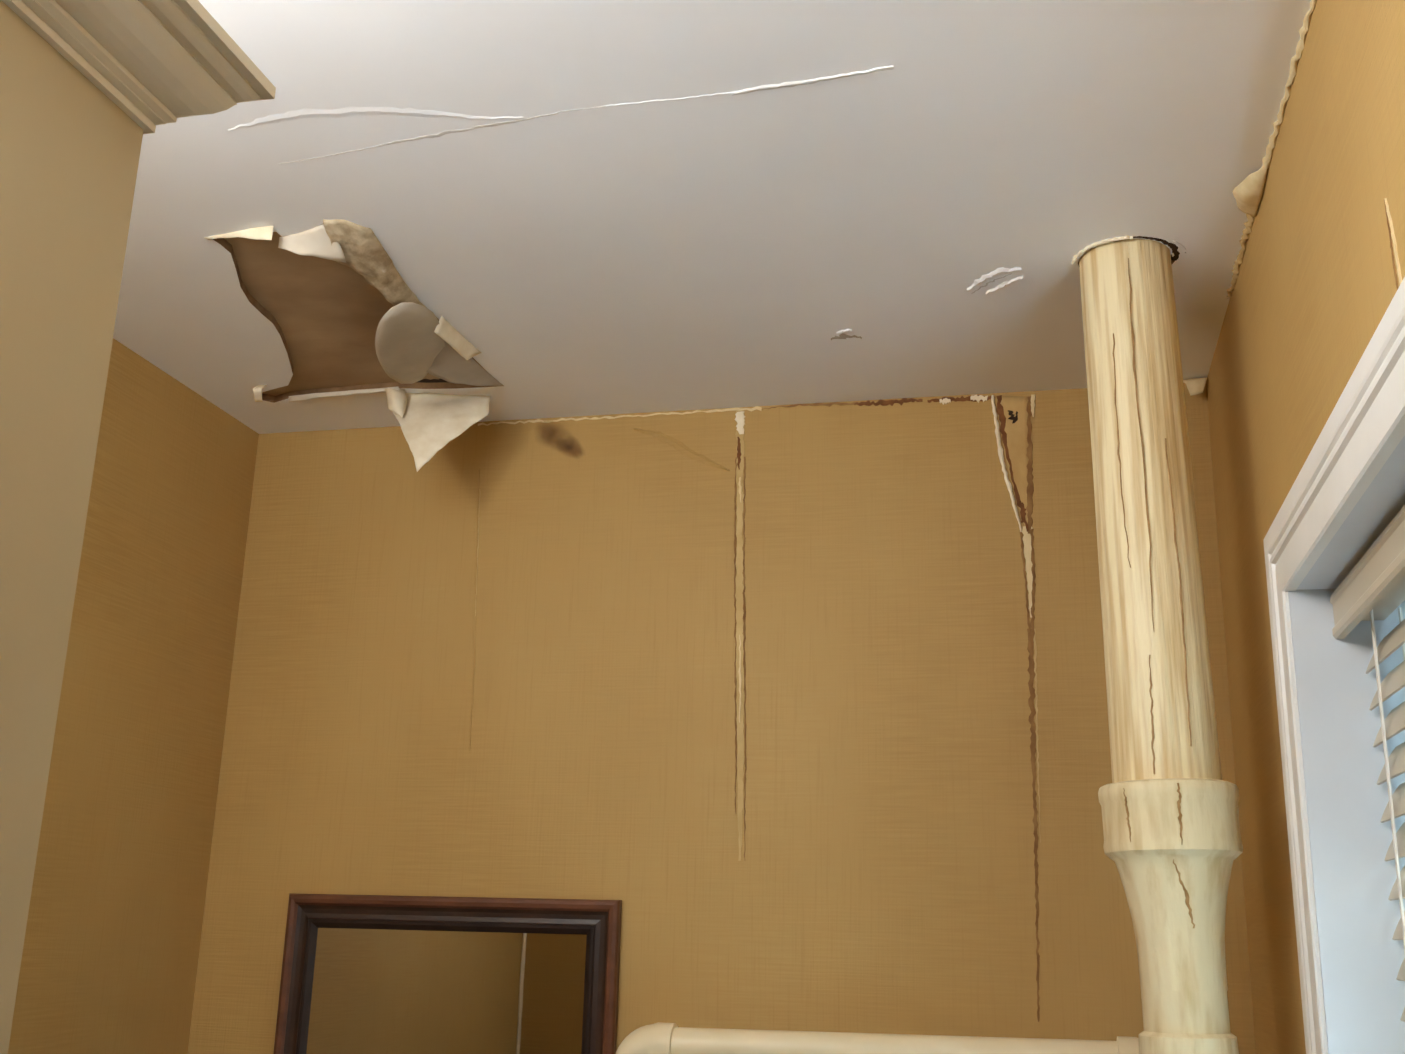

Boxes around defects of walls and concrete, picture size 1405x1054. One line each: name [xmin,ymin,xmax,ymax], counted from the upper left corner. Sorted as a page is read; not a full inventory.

peeling [205,226,274,240]
peeling [434,316,481,360]
peeling [253,385,267,402]
crack [1113,258,1195,928]